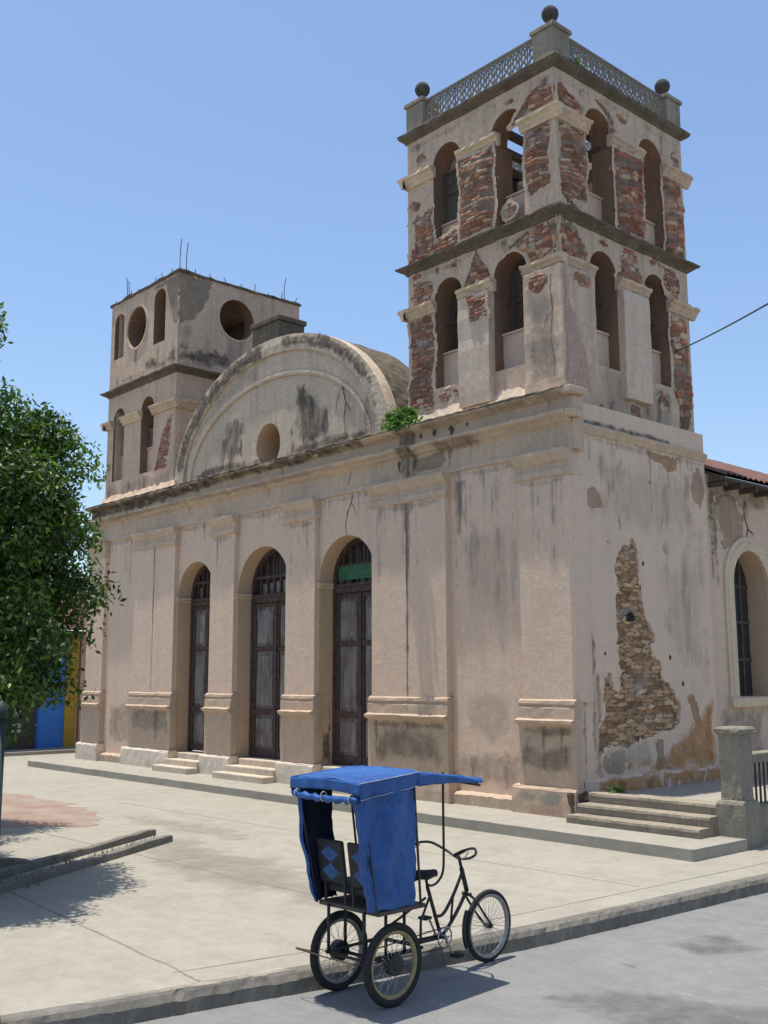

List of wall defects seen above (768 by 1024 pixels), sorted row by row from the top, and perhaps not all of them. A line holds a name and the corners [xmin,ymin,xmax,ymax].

spalling [407,78,686,390]
spalling [407,314,459,414]
crack [542,276,555,372]
spalling [655,312,694,431]
spalling [153,408,173,473]
water stain [90,386,364,519]
spalling [595,530,701,776]